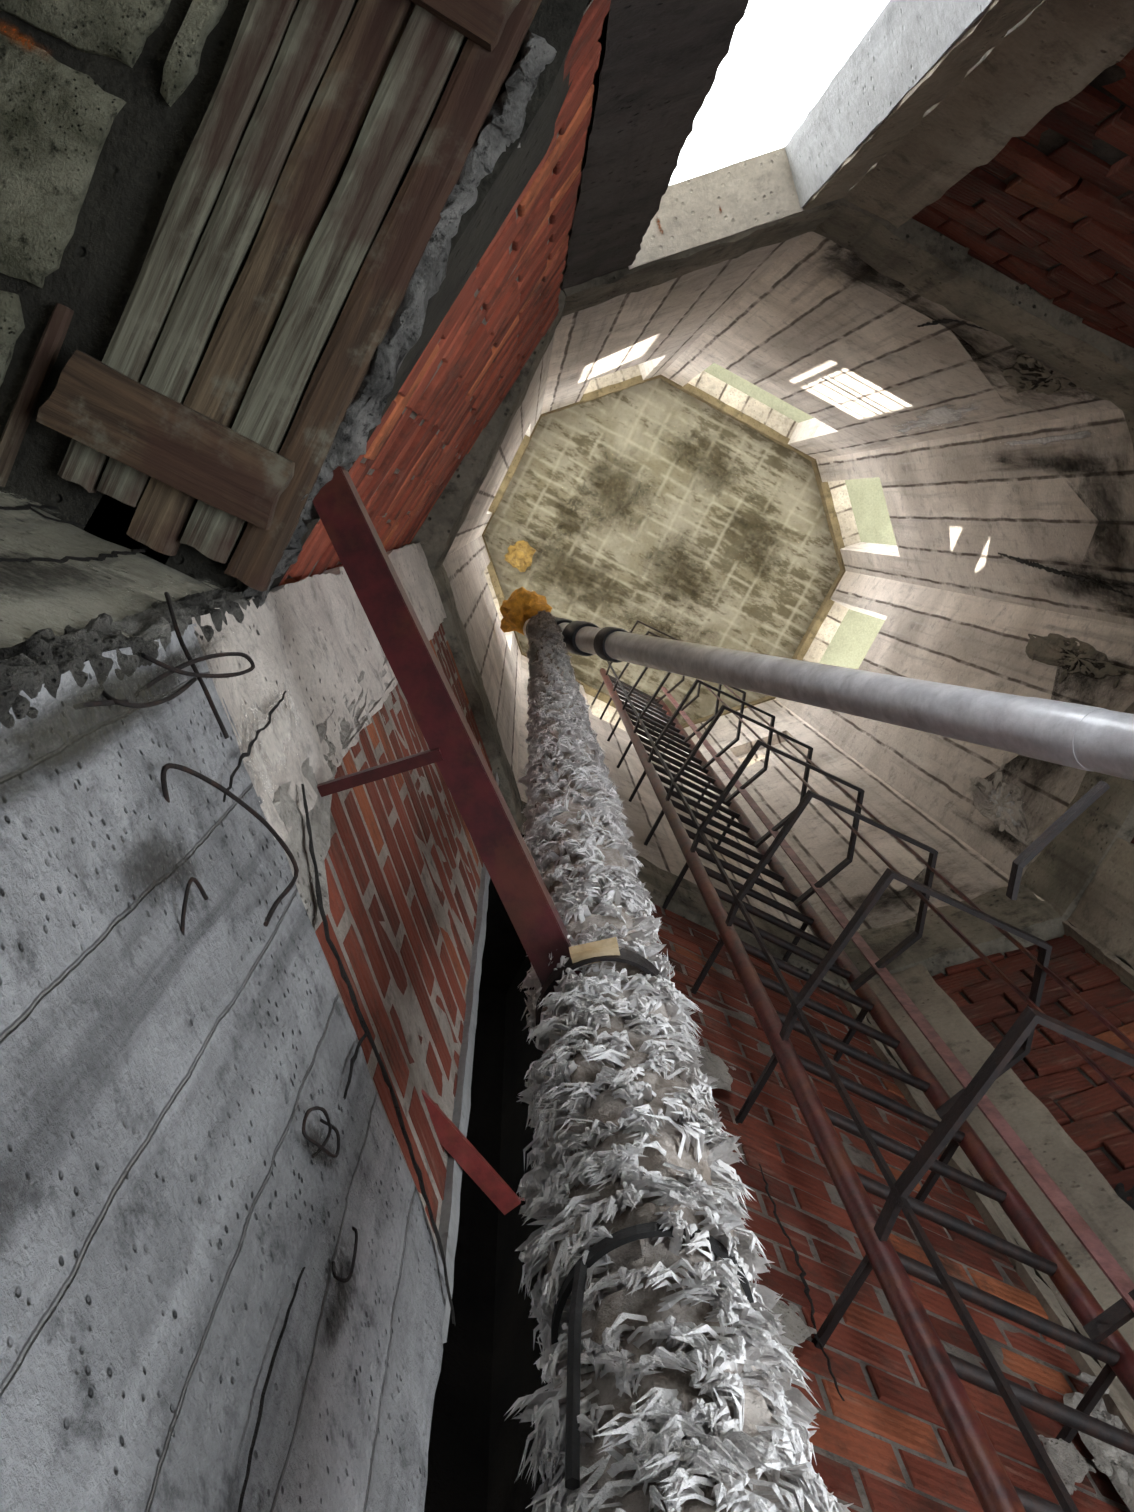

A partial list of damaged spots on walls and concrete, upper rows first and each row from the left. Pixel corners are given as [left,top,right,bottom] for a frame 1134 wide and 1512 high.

spalling [0,30,557,729]
water stain [675,440,731,490]
crack [0,504,148,563]
mould [534,456,650,606]
water stain [648,546,707,600]
water stain [734,514,778,574]
water stain [997,431,1134,613]
water stain [1054,651,1118,706]
spalling [266,657,395,931]
water stain [977,755,1063,844]
spalling [1063,1371,1129,1433]
spalling [1038,1431,1134,1512]